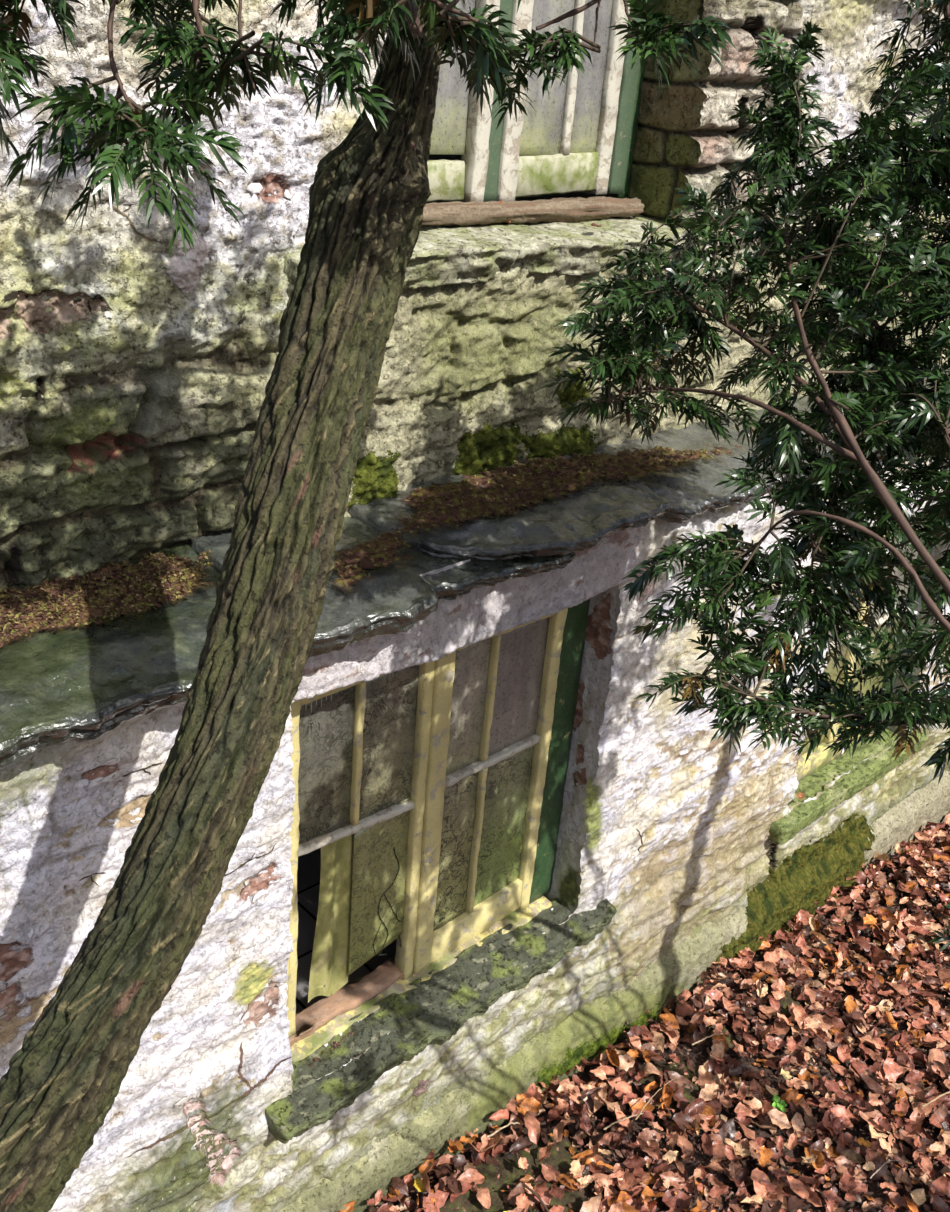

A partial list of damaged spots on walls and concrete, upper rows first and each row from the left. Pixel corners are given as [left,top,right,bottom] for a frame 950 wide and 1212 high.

flaking render [246,172,296,204]
flaking render [0,285,113,341]
peeling [237,862,281,904]
flaking render [0,936,59,1048]
leakage [118,1087,243,1212]